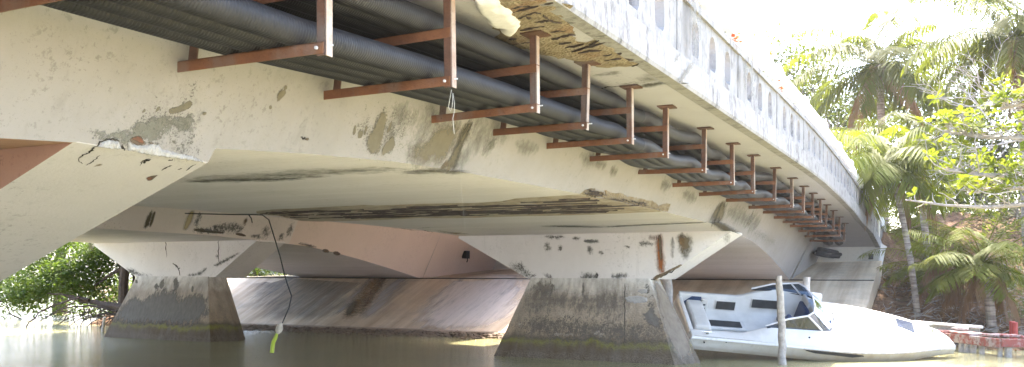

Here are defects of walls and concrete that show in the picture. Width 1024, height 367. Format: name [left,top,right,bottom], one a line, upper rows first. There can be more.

spalling [474,0,639,68]
peeling [92,80,206,165]
crack [141,159,196,171]
damp [195,173,305,182]
damp [409,122,492,174]
spalling [256,188,670,222]
damp [545,226,604,254]
rust [650,233,692,273]